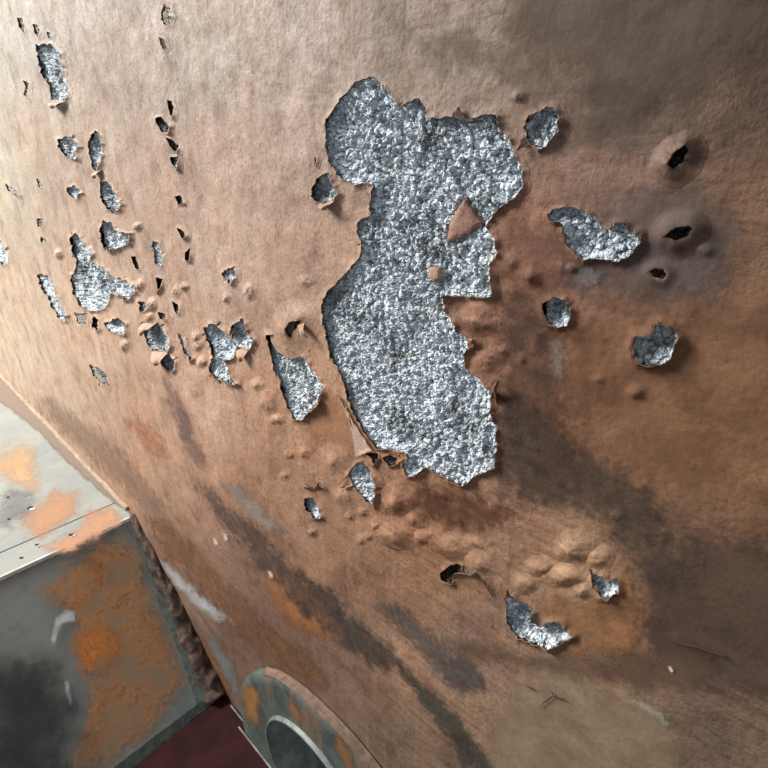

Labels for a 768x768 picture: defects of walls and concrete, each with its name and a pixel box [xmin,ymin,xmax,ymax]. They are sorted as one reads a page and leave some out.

spalling [14,14,73,109]
spalling [32,126,197,376]
spalling [542,200,643,267]
spalling [199,71,570,513]
spalling [625,314,689,373]
water stain [162,563,231,622]
spalling [435,561,480,589]
water stain [195,393,768,768]
spalling [498,589,577,654]
spalling [583,563,627,603]